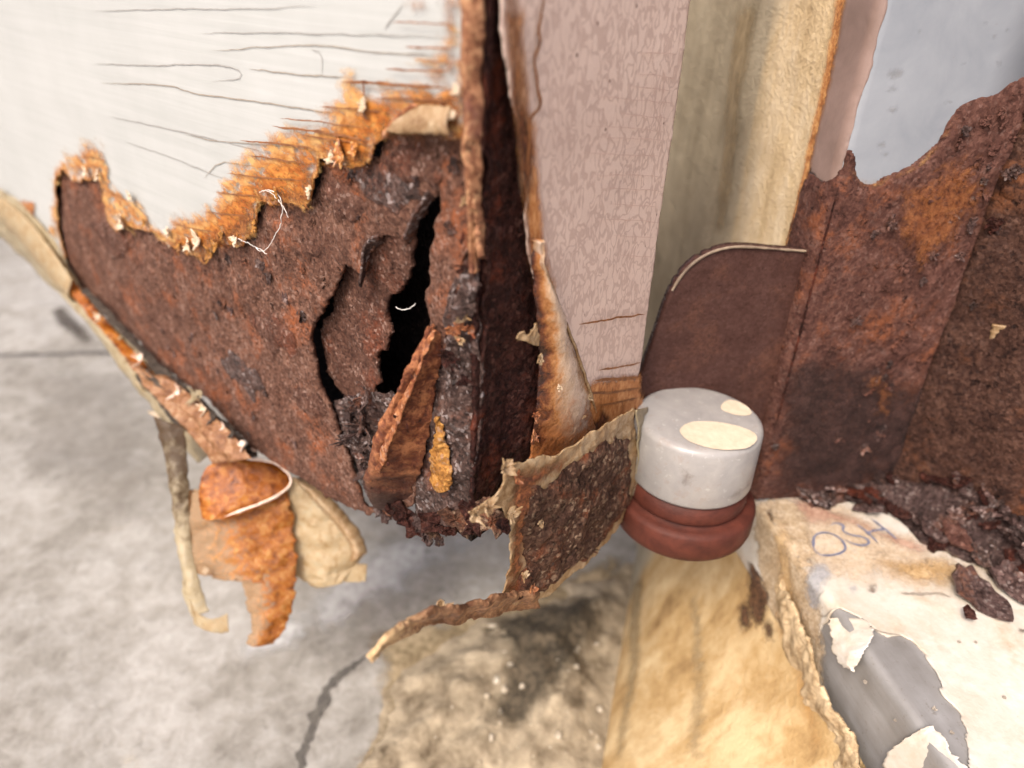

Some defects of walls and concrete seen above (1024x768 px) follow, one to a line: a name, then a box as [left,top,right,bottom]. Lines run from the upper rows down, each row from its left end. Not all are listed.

crack [96,4,453,232]
peeling [323,138,357,169]
peeling [374,82,460,156]
corrosion [49,0,555,547]
spalling [330,196,441,482]
corrosion [750,0,1024,623]
peeling [366,407,648,663]
corrosion [739,563,772,636]
peeling [828,618,875,672]
crack [295,655,366,768]
peeling [882,726,968,768]